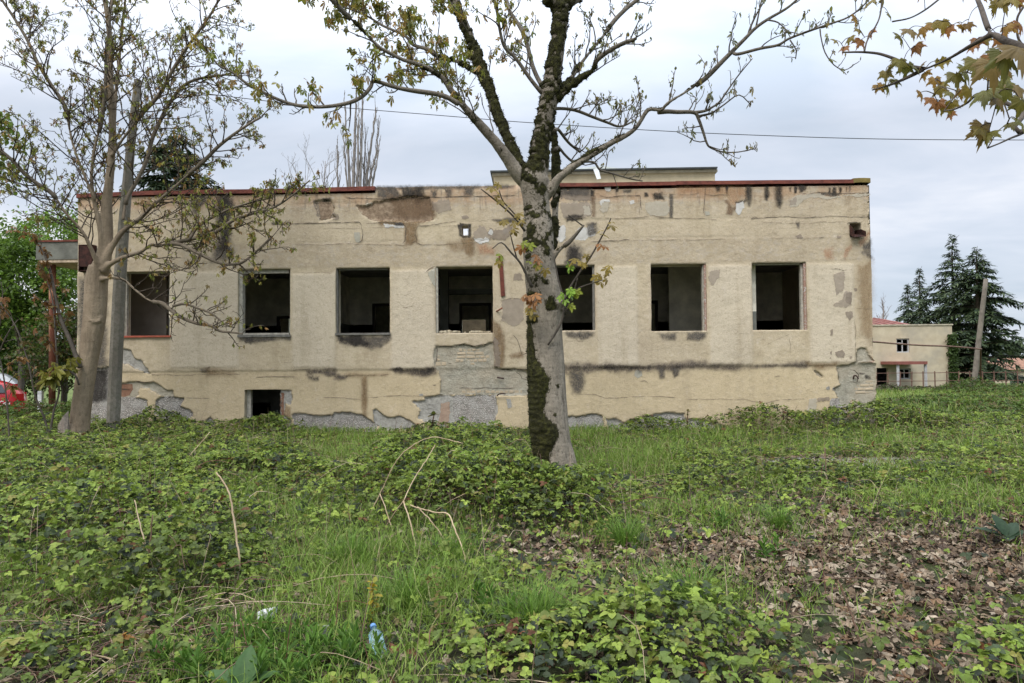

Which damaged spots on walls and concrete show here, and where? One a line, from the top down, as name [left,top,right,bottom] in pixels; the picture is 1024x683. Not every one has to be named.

spalling [356,196,451,244]
peeling [557,187,611,242]
leakage [716,185,752,215]
leakage [765,184,806,206]
leakage [338,335,391,348]
spalling [91,367,109,423]
spalling [120,349,193,425]
leakage [308,368,347,380]
spalling [280,343,528,432]
leakage [395,368,436,376]
leakage [565,362,740,393]
spalling [807,347,877,425]